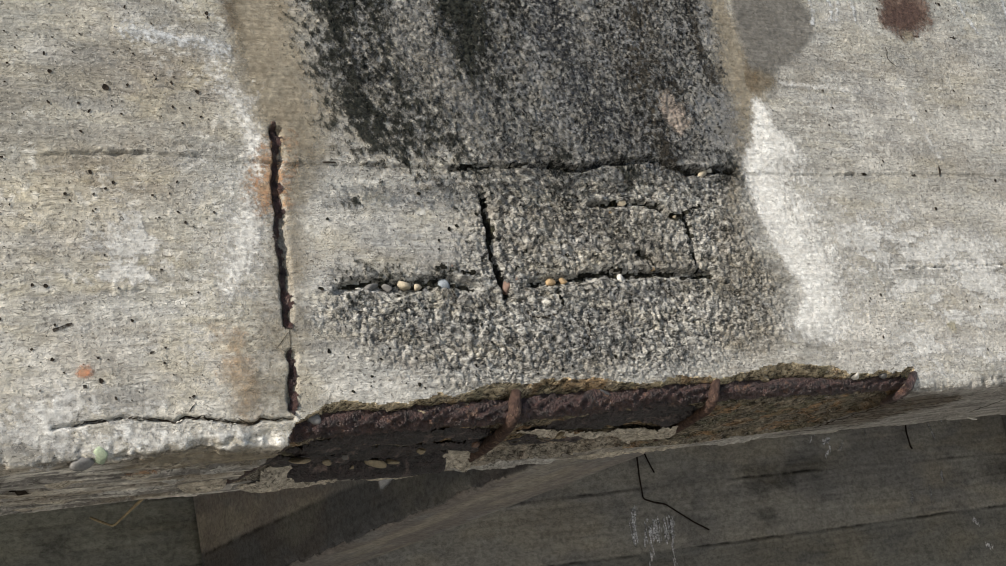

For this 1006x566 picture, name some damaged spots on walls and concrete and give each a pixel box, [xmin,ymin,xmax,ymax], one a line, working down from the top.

rust [879,0,933,40]
rust [244,137,297,216]
leakage [119,0,1006,377]
leakage [73,211,167,285]
crack [56,404,293,429]
spalling [100,362,917,495]